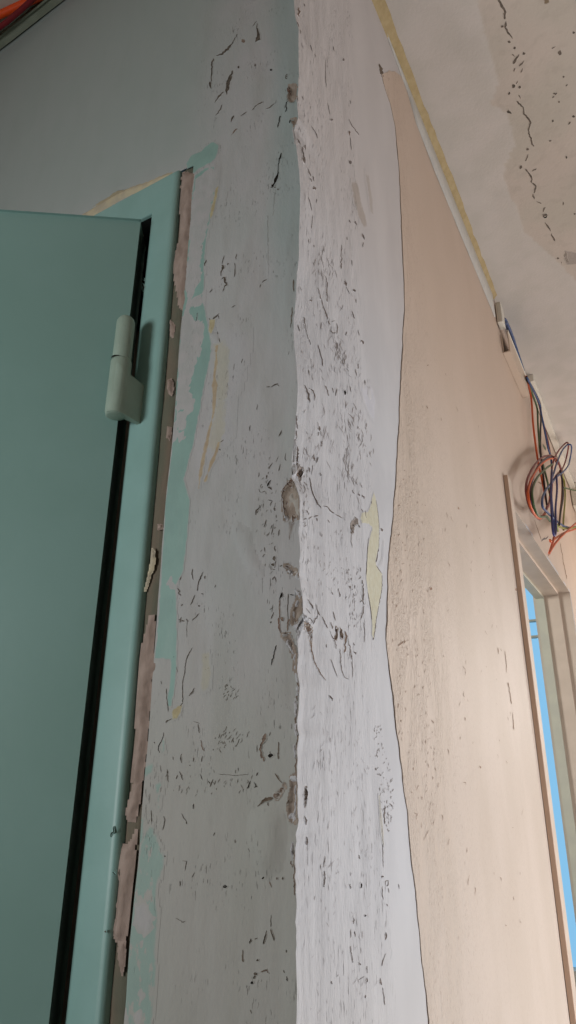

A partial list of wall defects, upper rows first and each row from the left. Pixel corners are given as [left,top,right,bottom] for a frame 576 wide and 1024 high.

peeling [83,172,172,216]
crack [270,45,365,381]
crack [497,0,556,241]
spalling [255,416,322,536]
peeling [360,491,385,640]
spalling [257,547,326,895]
peeling [124,738,168,1024]